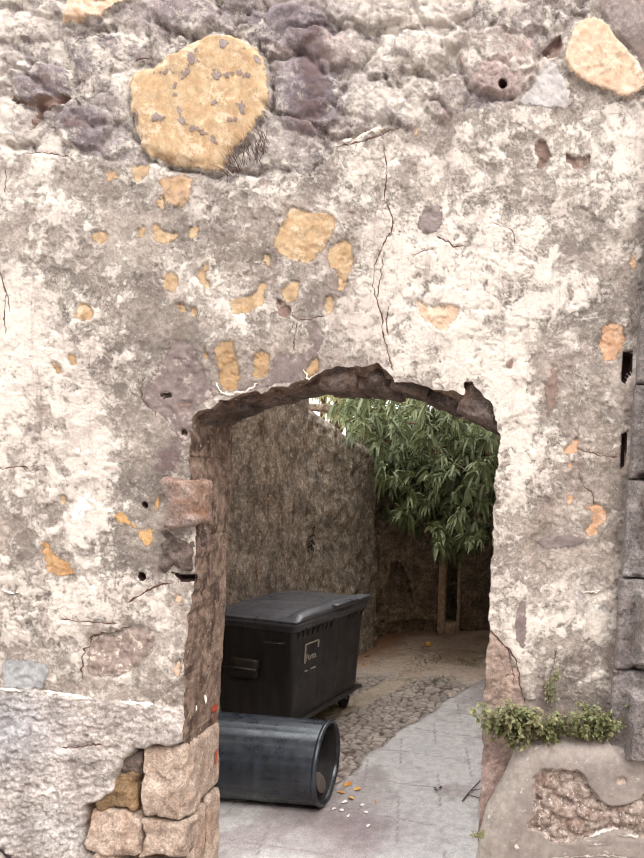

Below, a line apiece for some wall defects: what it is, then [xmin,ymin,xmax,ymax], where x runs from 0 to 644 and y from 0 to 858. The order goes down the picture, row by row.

flaking render [263,207,354,318]
crack [336,127,401,370]
crack [0,273,10,333]
flaking render [597,323,625,363]
spalling [142,321,324,441]
crack [578,448,617,504]
flaking render [584,504,606,536]
flaking render [42,541,73,576]
crack [128,583,171,603]
crack [60,618,131,678]
crack [490,630,525,702]